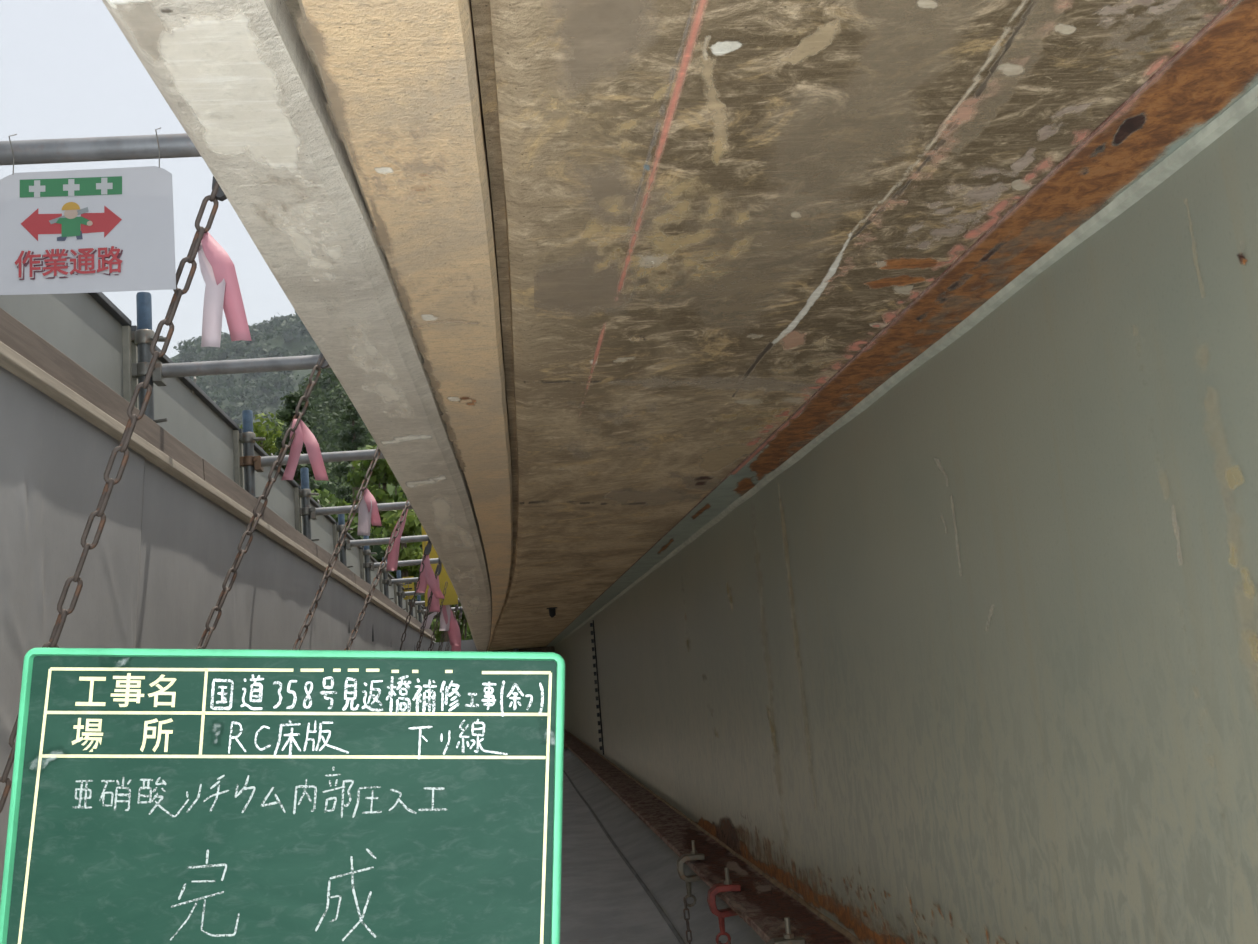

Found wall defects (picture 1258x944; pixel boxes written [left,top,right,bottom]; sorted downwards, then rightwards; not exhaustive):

crack [533,0,1066,397]
rust [551,0,1258,642]
rust [683,817,952,944]